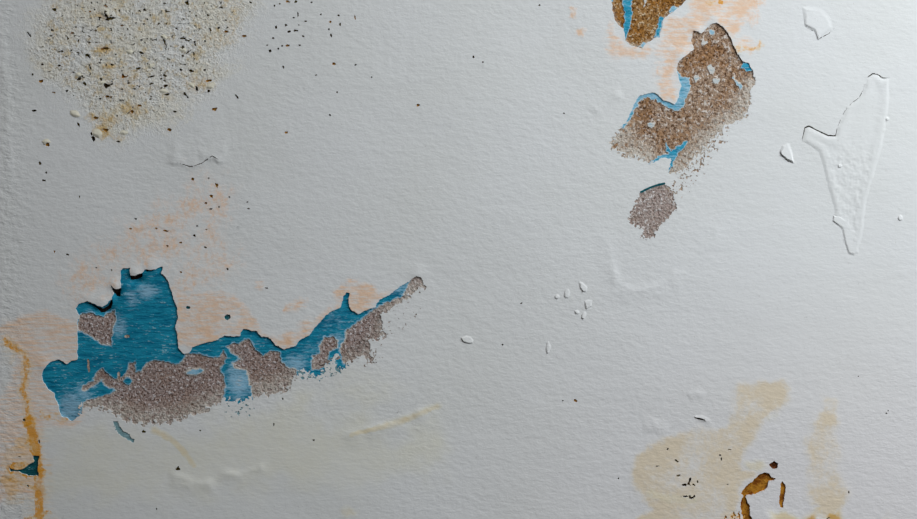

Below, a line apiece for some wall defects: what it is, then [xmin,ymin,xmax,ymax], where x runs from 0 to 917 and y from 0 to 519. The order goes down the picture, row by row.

peeling [612,0,685,48]
peeling [609,23,756,239]
damp [598,0,773,104]
corrosion [0,334,70,519]
damp [0,157,459,519]
peeling [42,267,426,443]
damp [627,372,797,519]
damp [763,390,858,519]